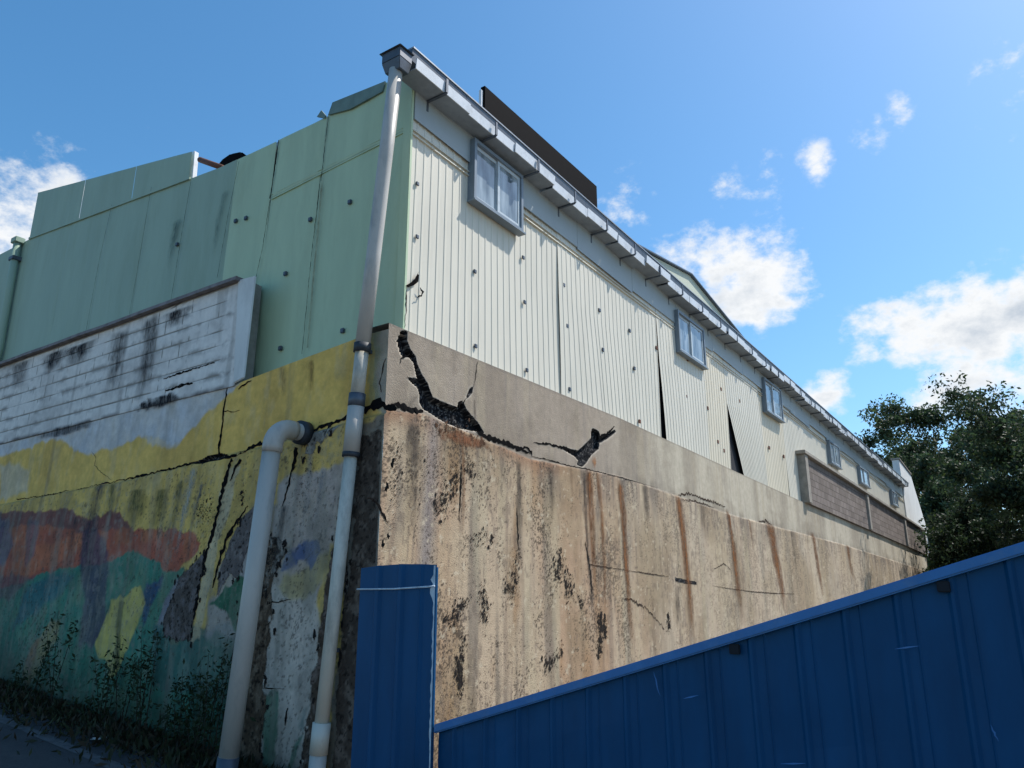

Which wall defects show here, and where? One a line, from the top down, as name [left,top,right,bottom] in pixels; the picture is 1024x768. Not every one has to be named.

leakage [47,343,87,368]
crack [17,380,263,636]
leakage [141,393,176,410]
peeling [240,533,288,765]
peeling [297,536,334,768]
peeling [297,422,338,506]
crack [282,330,652,506]
corrosion [619,485,629,608]
crack [625,598,664,629]
corrosion [677,498,692,619]
corrosion [727,513,740,593]
corrosion [768,526,784,596]